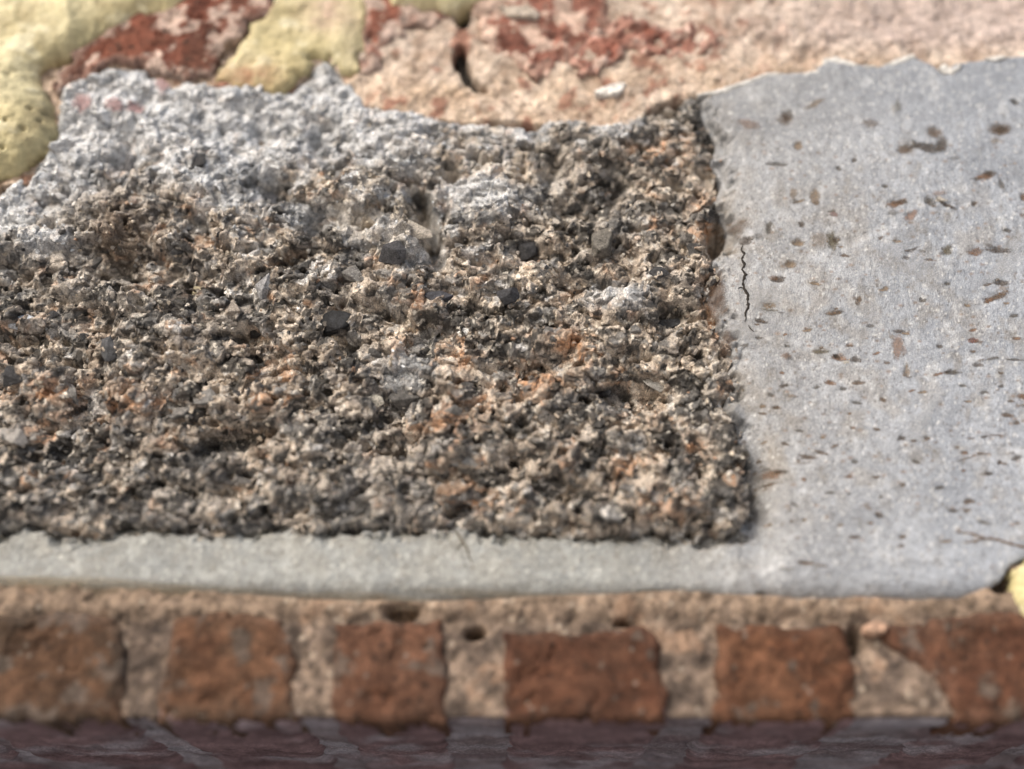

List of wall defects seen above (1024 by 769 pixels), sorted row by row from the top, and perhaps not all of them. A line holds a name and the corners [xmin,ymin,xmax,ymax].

peeling [802,54,916,74]
spalling [0,62,781,551]
crack [738,245,754,332]